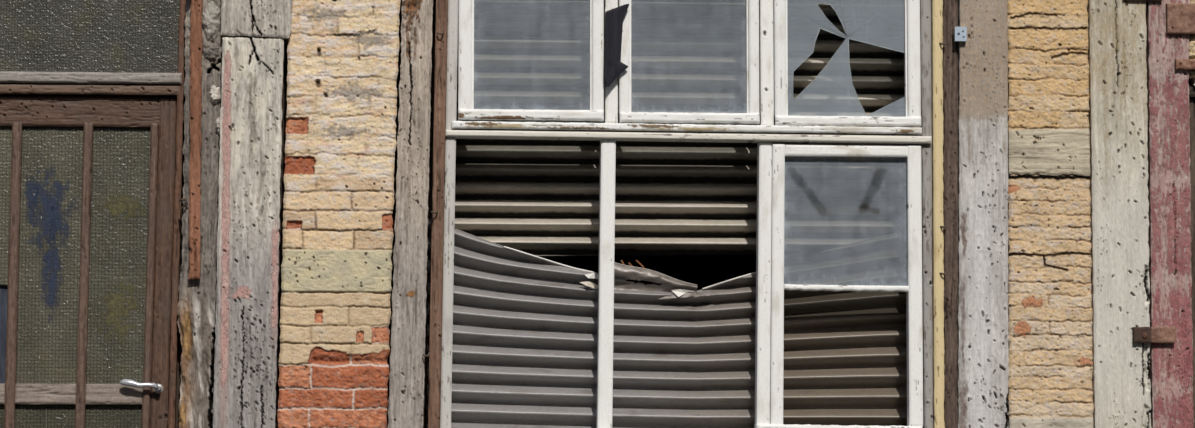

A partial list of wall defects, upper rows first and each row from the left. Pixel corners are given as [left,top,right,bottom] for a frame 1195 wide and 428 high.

crack [207,0,273,75]
peeling [1149,0,1194,428]